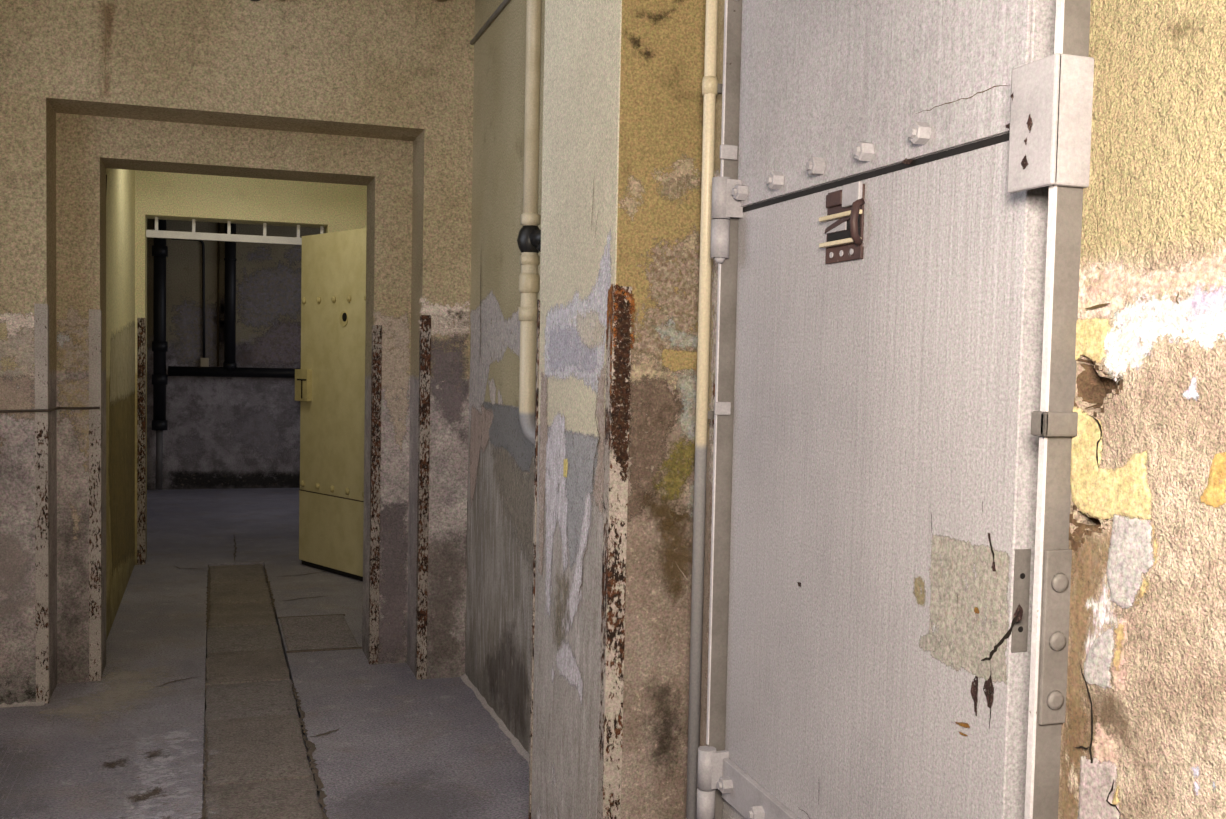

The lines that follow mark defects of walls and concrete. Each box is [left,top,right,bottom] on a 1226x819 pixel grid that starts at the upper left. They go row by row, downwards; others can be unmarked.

peeling [0,309,35,421]
peeling [370,229,612,575]
rust [606,284,636,478]
peeling [1069,240,1226,697]
crack [1074,665,1121,819]
peeling [1077,722,1122,819]
peeling [1192,766,1216,795]